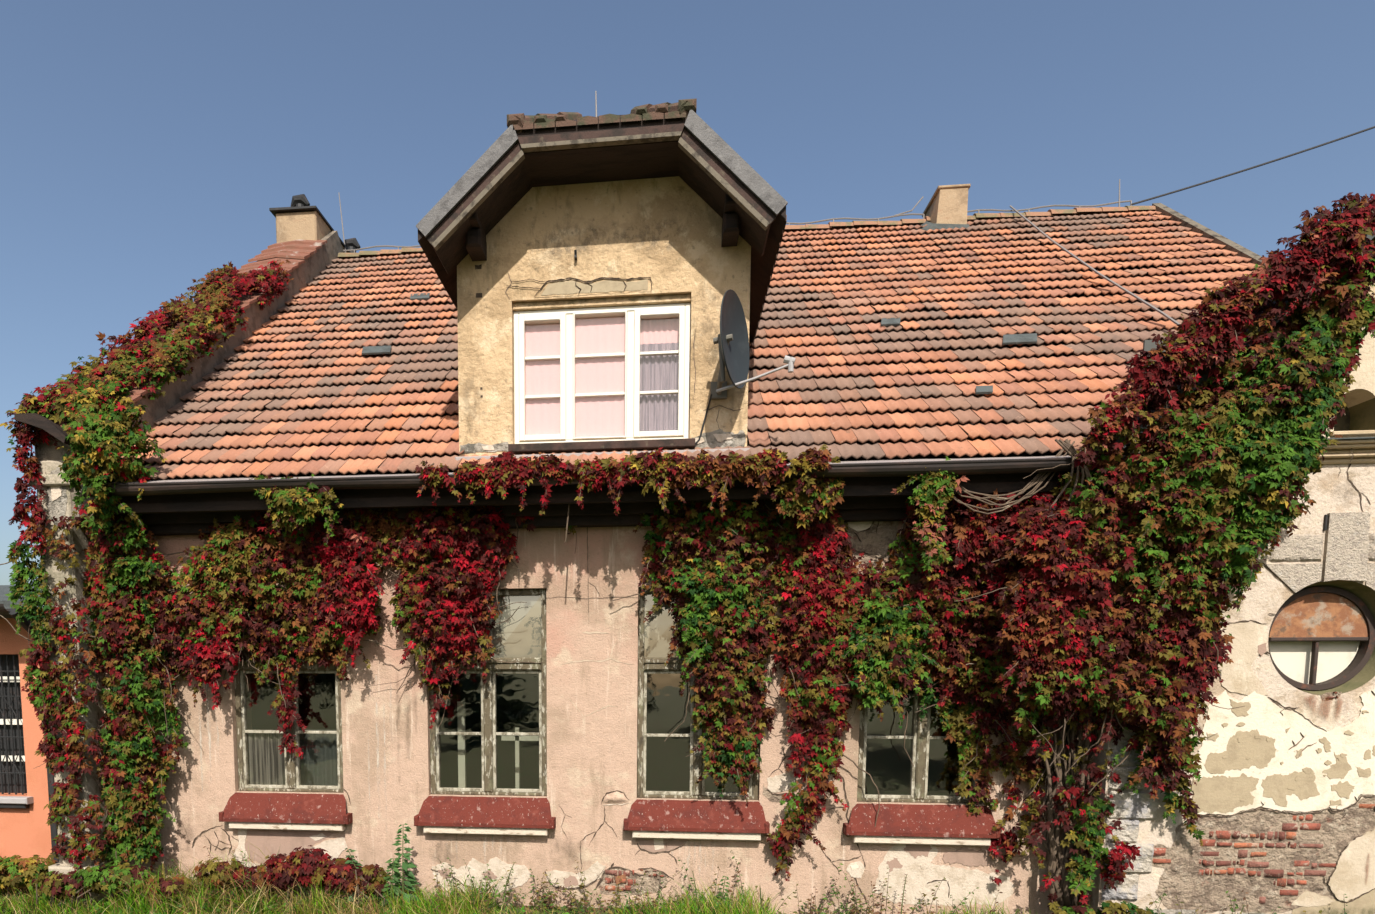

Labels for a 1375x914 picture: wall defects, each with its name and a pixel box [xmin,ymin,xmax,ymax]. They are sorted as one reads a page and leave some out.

crack [505,273,652,298]
crack [1228,613,1276,654]
crack [1268,697,1326,756]
peeling [1152,621,1375,914]
peeling [432,857,668,896]
crack [545,806,690,890]
peeling [637,838,688,852]
peeling [846,844,1014,907]
crack [1199,794,1375,903]